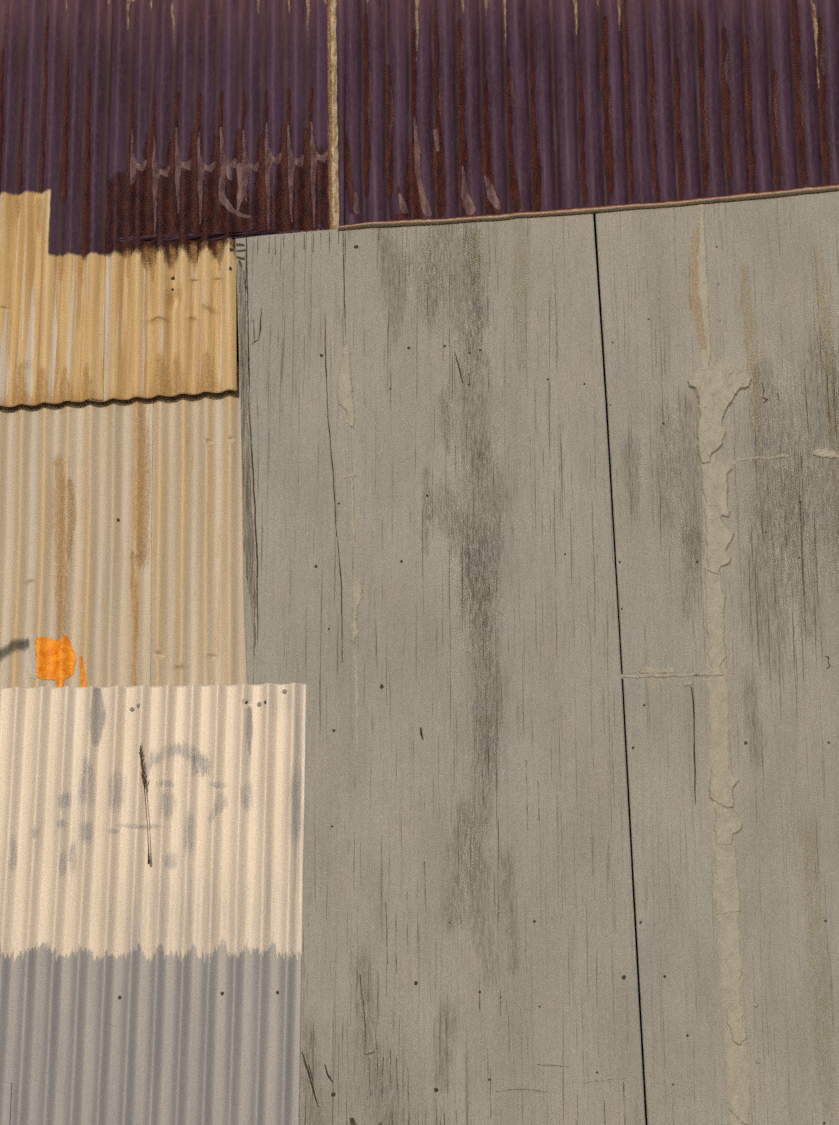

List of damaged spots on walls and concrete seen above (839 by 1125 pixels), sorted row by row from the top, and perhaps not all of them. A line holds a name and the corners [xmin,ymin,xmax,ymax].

rust [80,70,91,276]
rust [104,12,370,276]
rust [385,29,423,220]
rust [433,12,467,215]
rust [481,78,499,214]
rust [506,31,541,212]
rust [601,0,633,200]
rust [743,35,755,192]
rust [792,0,807,184]
peeling [686,204,752,655]
peeling [676,672,731,767]
peeling [719,912,743,1002]